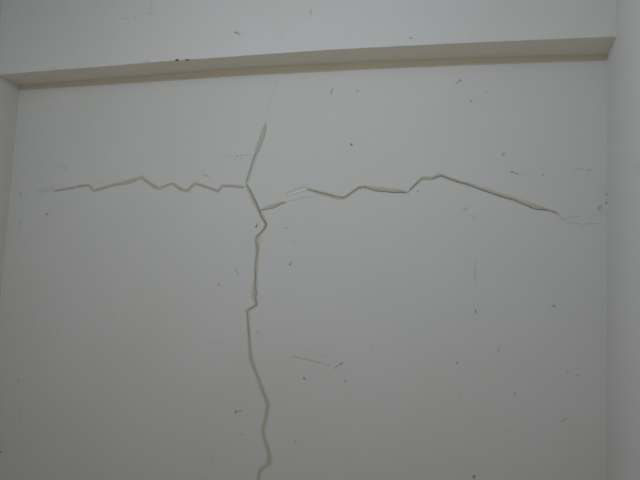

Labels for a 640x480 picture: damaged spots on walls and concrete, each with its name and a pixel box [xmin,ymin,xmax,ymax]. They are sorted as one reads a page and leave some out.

crack [37,123,559,480]